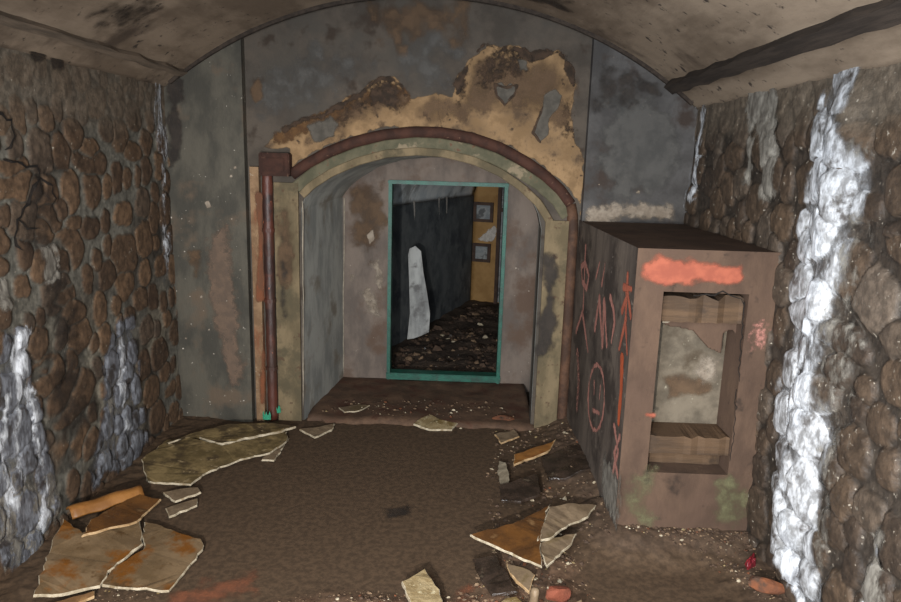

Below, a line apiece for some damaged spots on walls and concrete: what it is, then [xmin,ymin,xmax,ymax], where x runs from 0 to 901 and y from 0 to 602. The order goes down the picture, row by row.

flaking render [265,44,674,222]
damp [0,278,14,311]
damp [0,326,63,570]
damp [31,173,76,345]
damp [54,316,148,489]
damp [770,67,869,602]